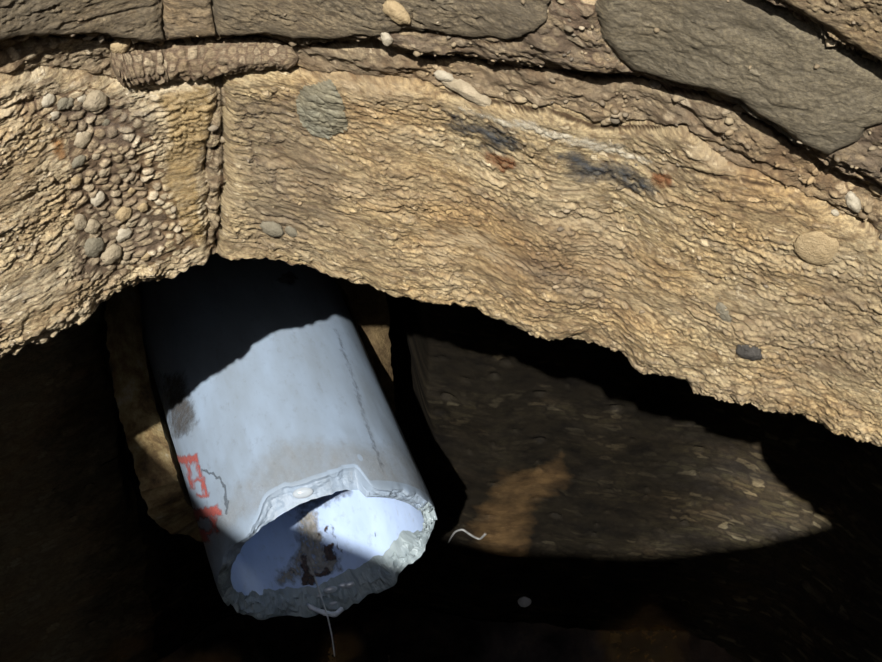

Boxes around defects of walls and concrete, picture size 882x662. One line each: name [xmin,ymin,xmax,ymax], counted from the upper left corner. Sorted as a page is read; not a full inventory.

damp [68,292,727,662]